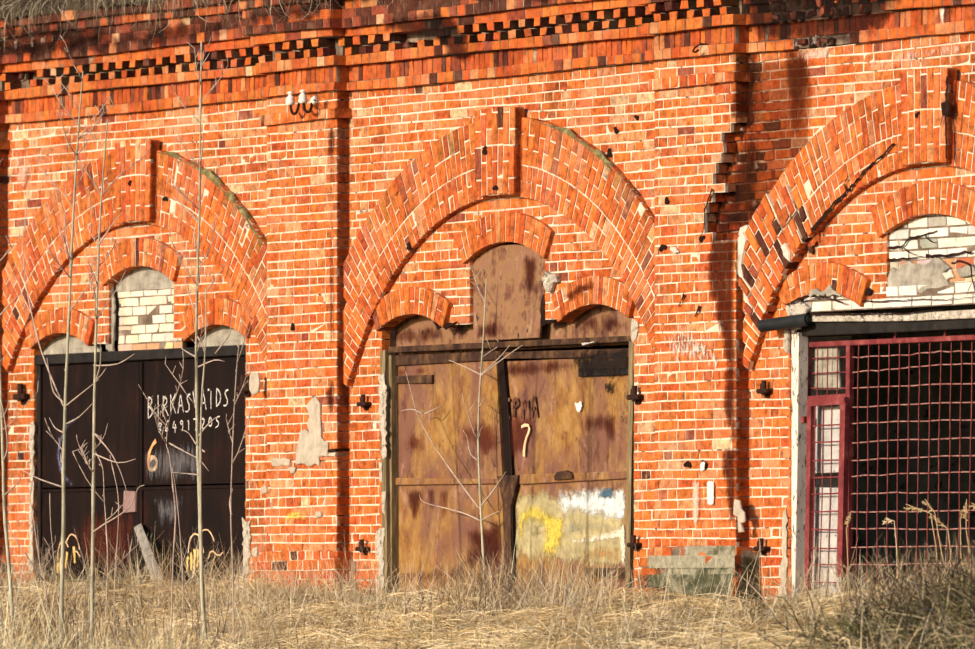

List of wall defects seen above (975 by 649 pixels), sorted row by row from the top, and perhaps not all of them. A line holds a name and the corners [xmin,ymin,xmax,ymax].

corrosion [525,259,534,287]
corrosion [409,491,432,515]
corrosion [467,525,498,575]